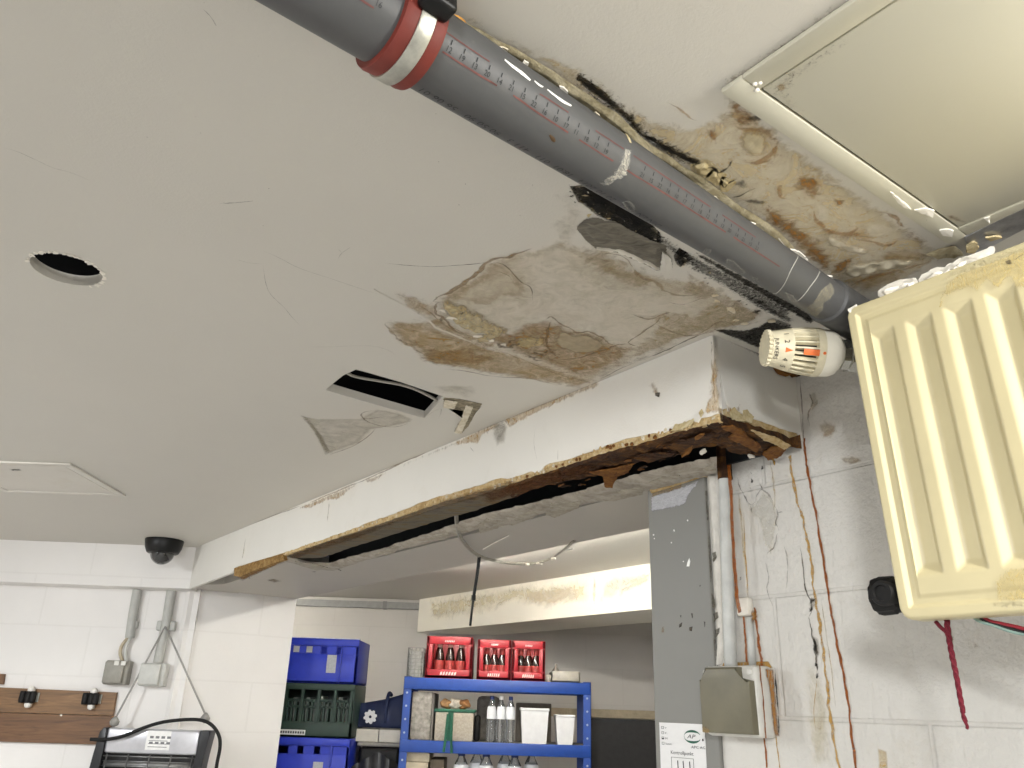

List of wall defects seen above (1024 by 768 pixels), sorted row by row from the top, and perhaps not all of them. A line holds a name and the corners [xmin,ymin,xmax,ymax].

water stain [708,147,921,285]
water stain [400,249,813,384]
spalling [440,398,482,434]
spalling [268,407,797,666]
corrosion [234,413,857,768]
crack [800,548,818,729]